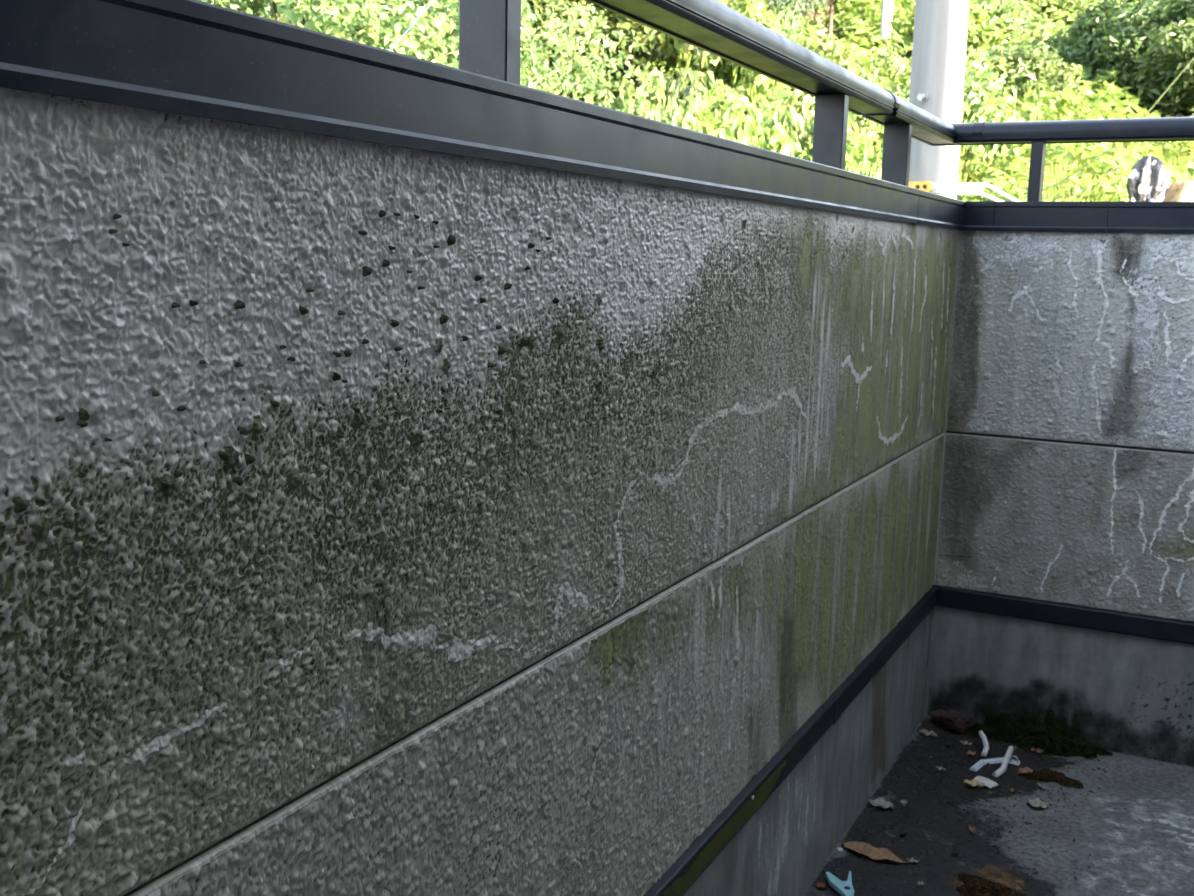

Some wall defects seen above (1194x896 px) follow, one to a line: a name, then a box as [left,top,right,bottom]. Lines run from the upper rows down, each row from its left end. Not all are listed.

crack [1008,240,1194,611]
water stain [1083,232,1190,505]
crack [267,384,806,680]
crack [66,751,85,767]
crack [123,701,228,765]
crack [587,730,622,811]
water stain [756,755,816,896]
water stain [928,676,1194,767]